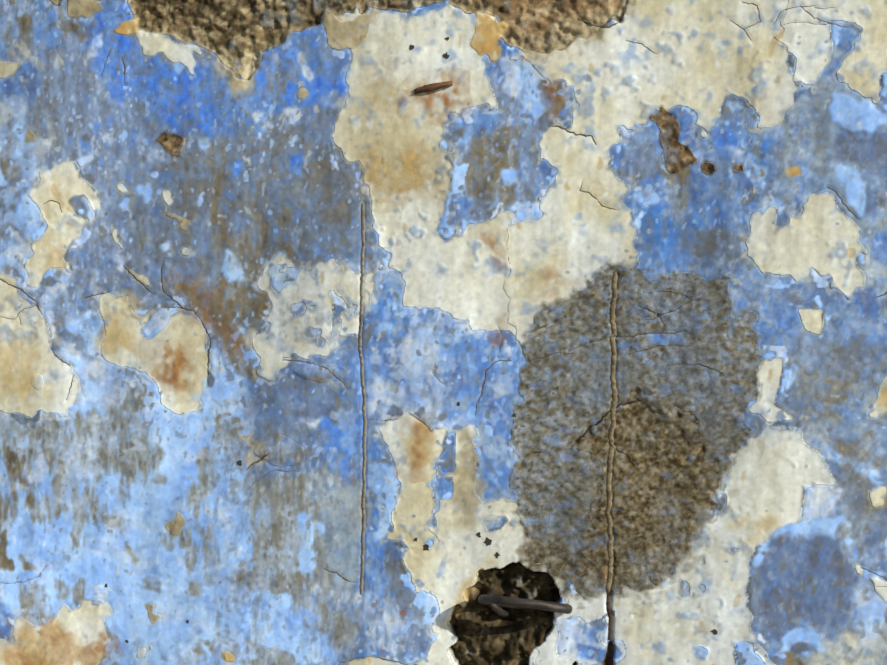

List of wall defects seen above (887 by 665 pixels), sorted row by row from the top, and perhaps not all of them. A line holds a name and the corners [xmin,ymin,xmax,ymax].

flaking render [51,0,103,18]
rust [417,83,459,108]
peeling [114,0,887,381]
crack [0,278,43,322]
crack [123,258,212,383]
peeling [869,375,887,418]
peeling [165,512,185,537]
peeling [343,358,836,665]
peeling [869,486,887,507]
peeling [855,565,887,603]
peeling [0,600,112,665]
peeling [145,604,161,624]